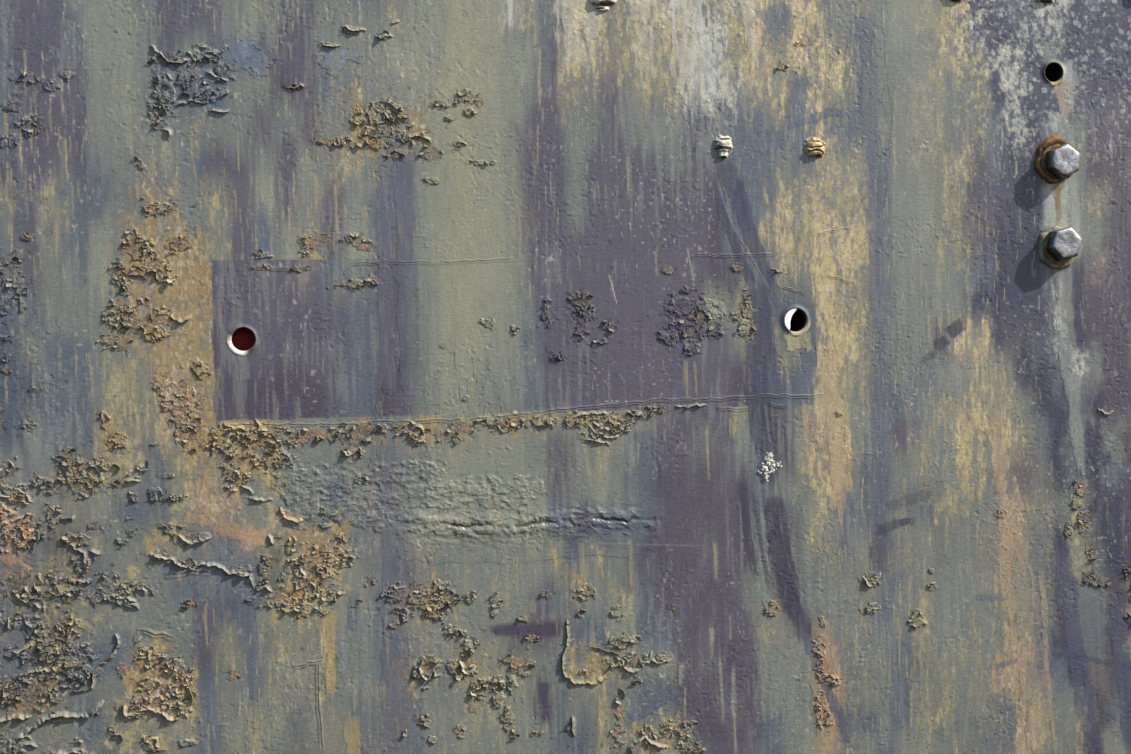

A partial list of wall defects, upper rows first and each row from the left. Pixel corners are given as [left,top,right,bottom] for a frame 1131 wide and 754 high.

peeling [146,36,278,141]
peeling [282,81,311,94]
peeling [310,86,497,186]
rust [1053,182,1061,226]
peeling [0,230,37,374]
peeling [97,194,195,355]
peeling [250,223,378,273]
peeling [325,270,390,290]
peeling [477,315,496,332]
peeling [728,262,758,342]
peeling [0,358,707,754]